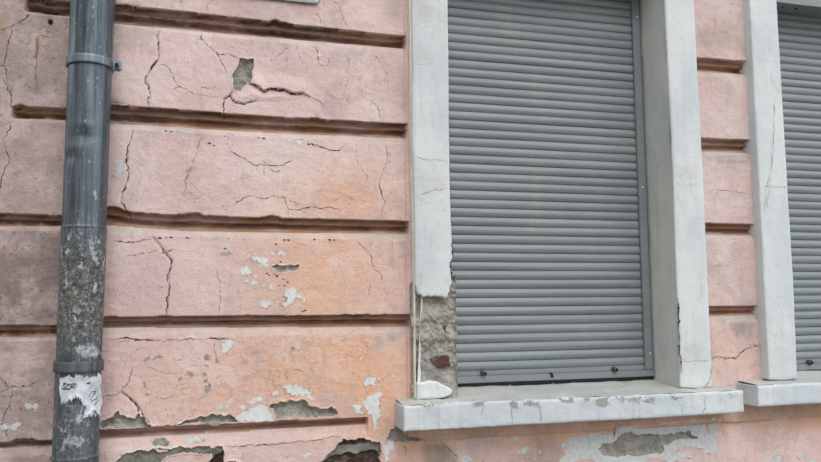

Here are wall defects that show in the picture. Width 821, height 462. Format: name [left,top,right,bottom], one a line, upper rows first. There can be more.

crack [0,0,53,188]
crack [144,30,323,172]
spalling [230,56,256,93]
crack [312,144,388,209]
crack [116,130,173,314]
peeling [240,239,311,312]
crack [117,336,233,359]
spalling [409,274,458,409]
crack [677,297,758,411]
spalling [99,380,340,462]
spalling [294,376,428,462]
peeling [559,417,722,462]